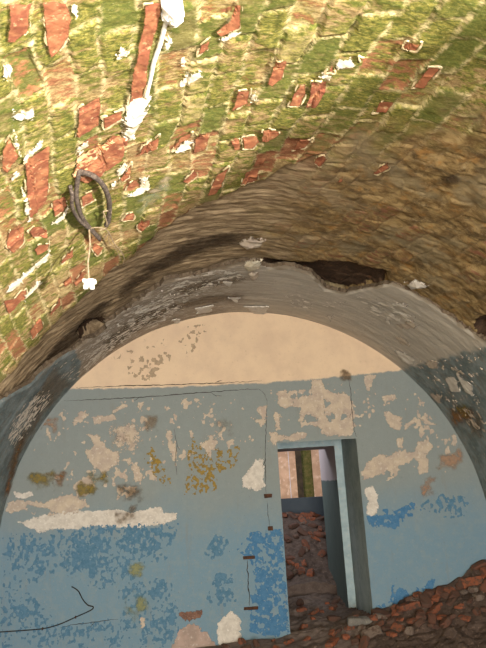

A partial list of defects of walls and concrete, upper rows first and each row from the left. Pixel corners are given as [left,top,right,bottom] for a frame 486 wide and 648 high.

spalling [72,2,161,208]
spalling [231,127,280,150]
peeling [66,270,246,380]
peeling [244,306,269,314]
spalling [262,257,388,286]
peeling [8,390,51,448]
peeling [251,374,469,529]
peeling [0,399,486,648]